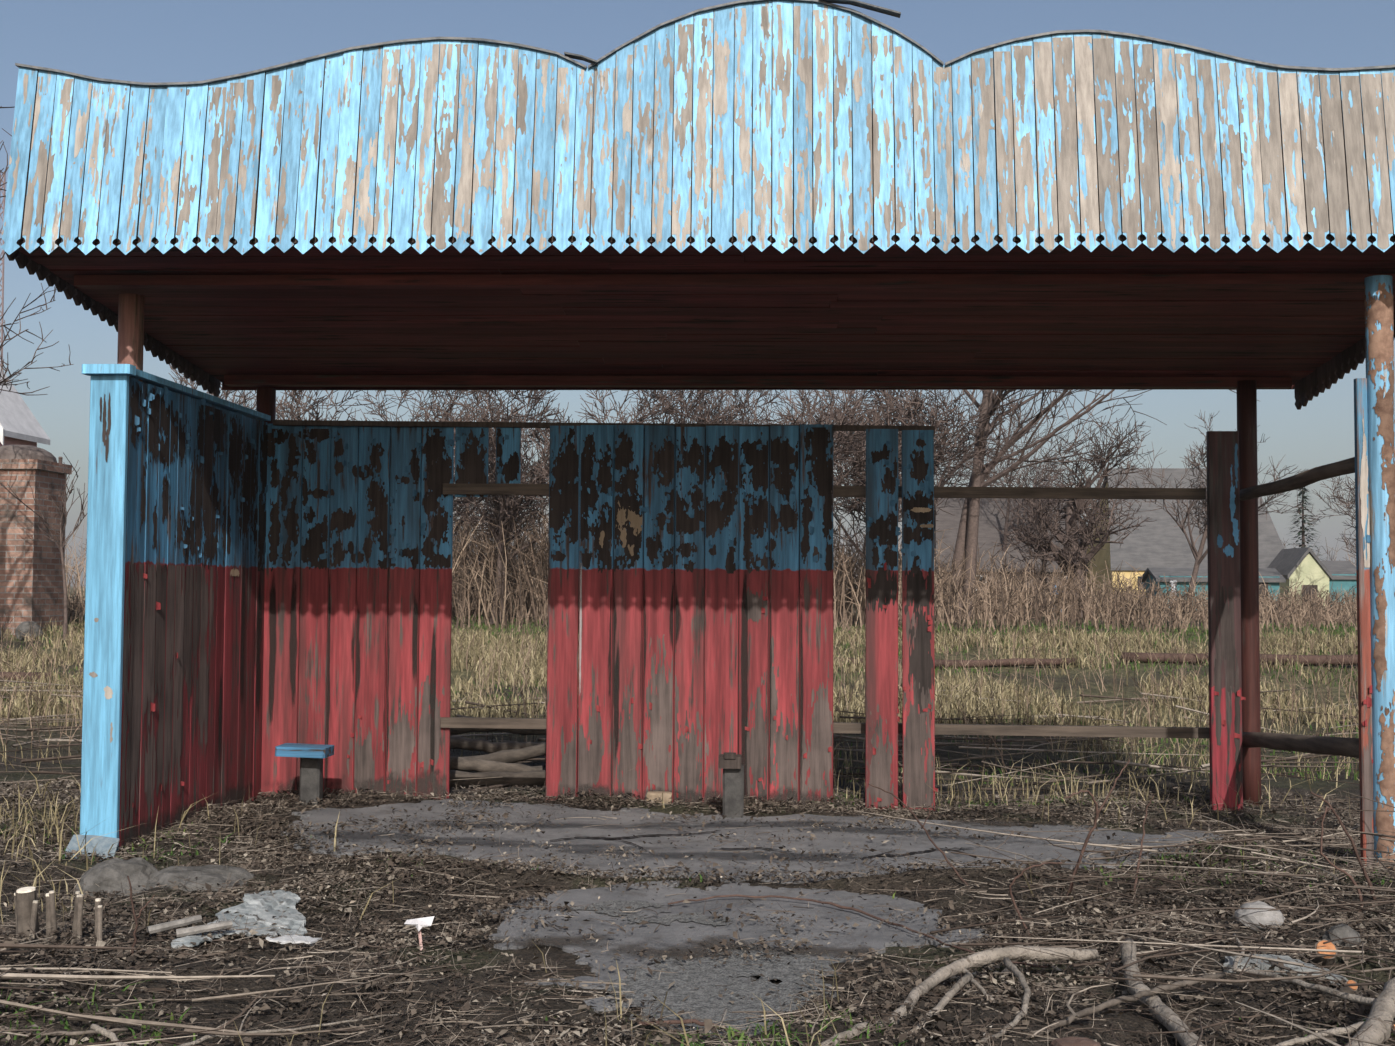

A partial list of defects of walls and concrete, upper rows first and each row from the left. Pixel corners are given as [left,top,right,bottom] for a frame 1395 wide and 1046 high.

peeling [9,5,1395,252]
peeling [121,381,519,848]
peeling [558,634,709,799]
peeling [549,427,833,625]
peeling [745,635,832,802]
peeling [867,432,938,808]
peeling [1214,586,1246,804]
corrosion [1364,282,1395,871]